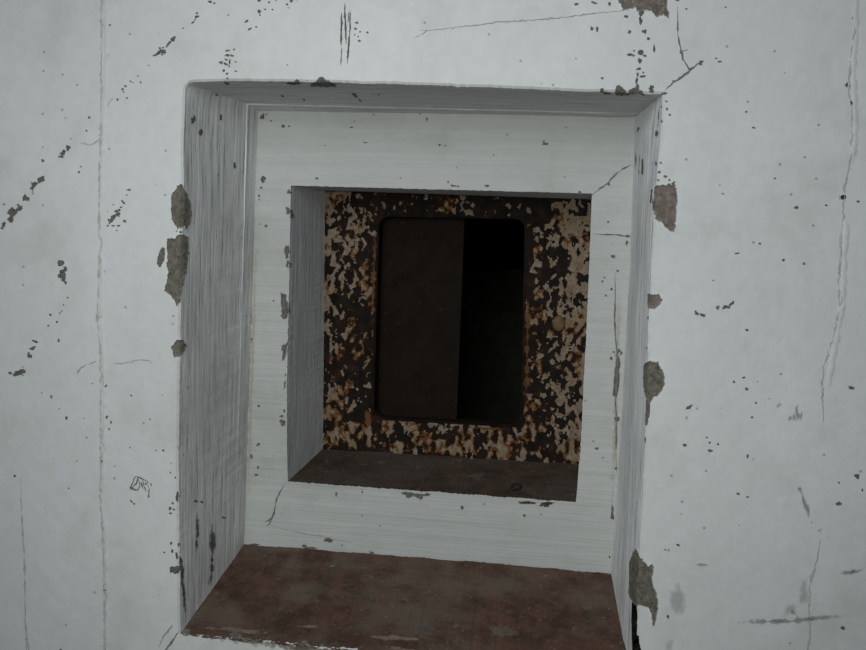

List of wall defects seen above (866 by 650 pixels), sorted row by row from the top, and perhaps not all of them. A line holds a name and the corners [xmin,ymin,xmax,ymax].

spalling [600,0,687,136]
crack [665,6,721,90]
spalling [650,161,678,232]
spalling [157,183,192,306]
spalling [171,339,186,358]
rust [323,192,591,464]
spalling [643,360,665,425]
crack [266,487,349,543]
crack [159,572,186,650]
spalling [628,548,669,650]